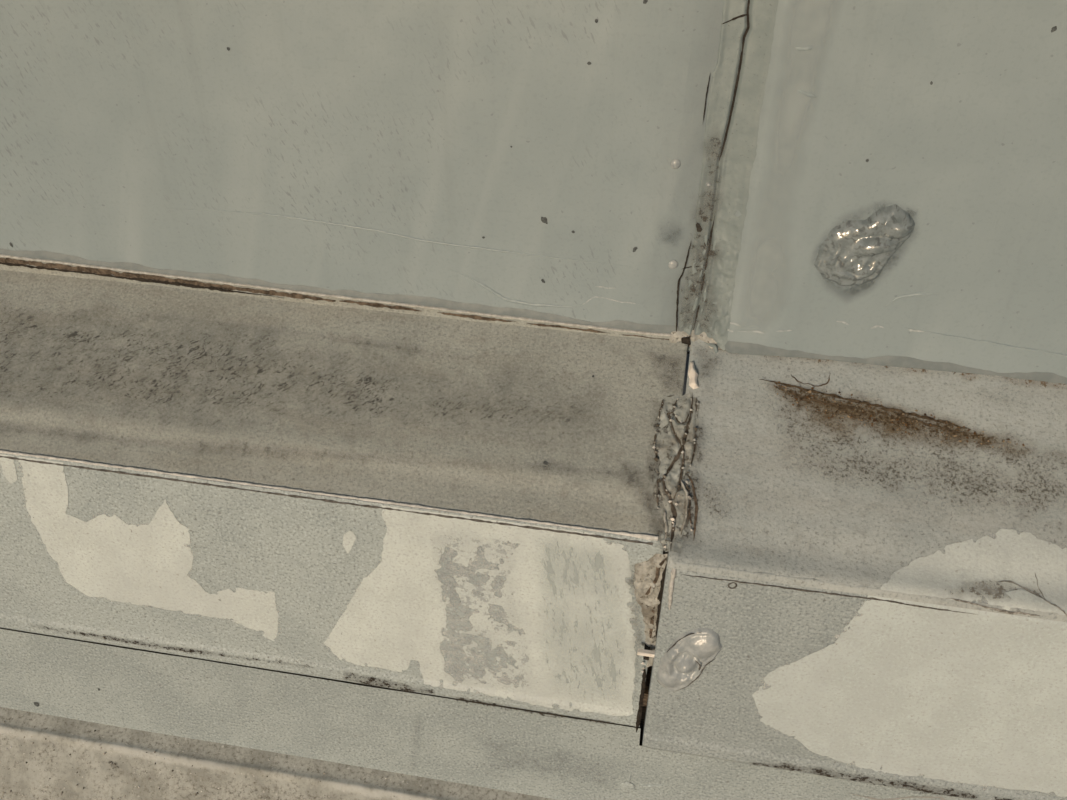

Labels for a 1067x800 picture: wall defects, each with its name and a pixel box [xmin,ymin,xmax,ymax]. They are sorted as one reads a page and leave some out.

crack [703,0,750,160]
crack [676,216,715,354]
rust [759,375,1025,451]
peeling [0,454,280,641]
peeling [324,505,645,716]
crack [640,392,977,638]
peeling [752,528,1067,797]